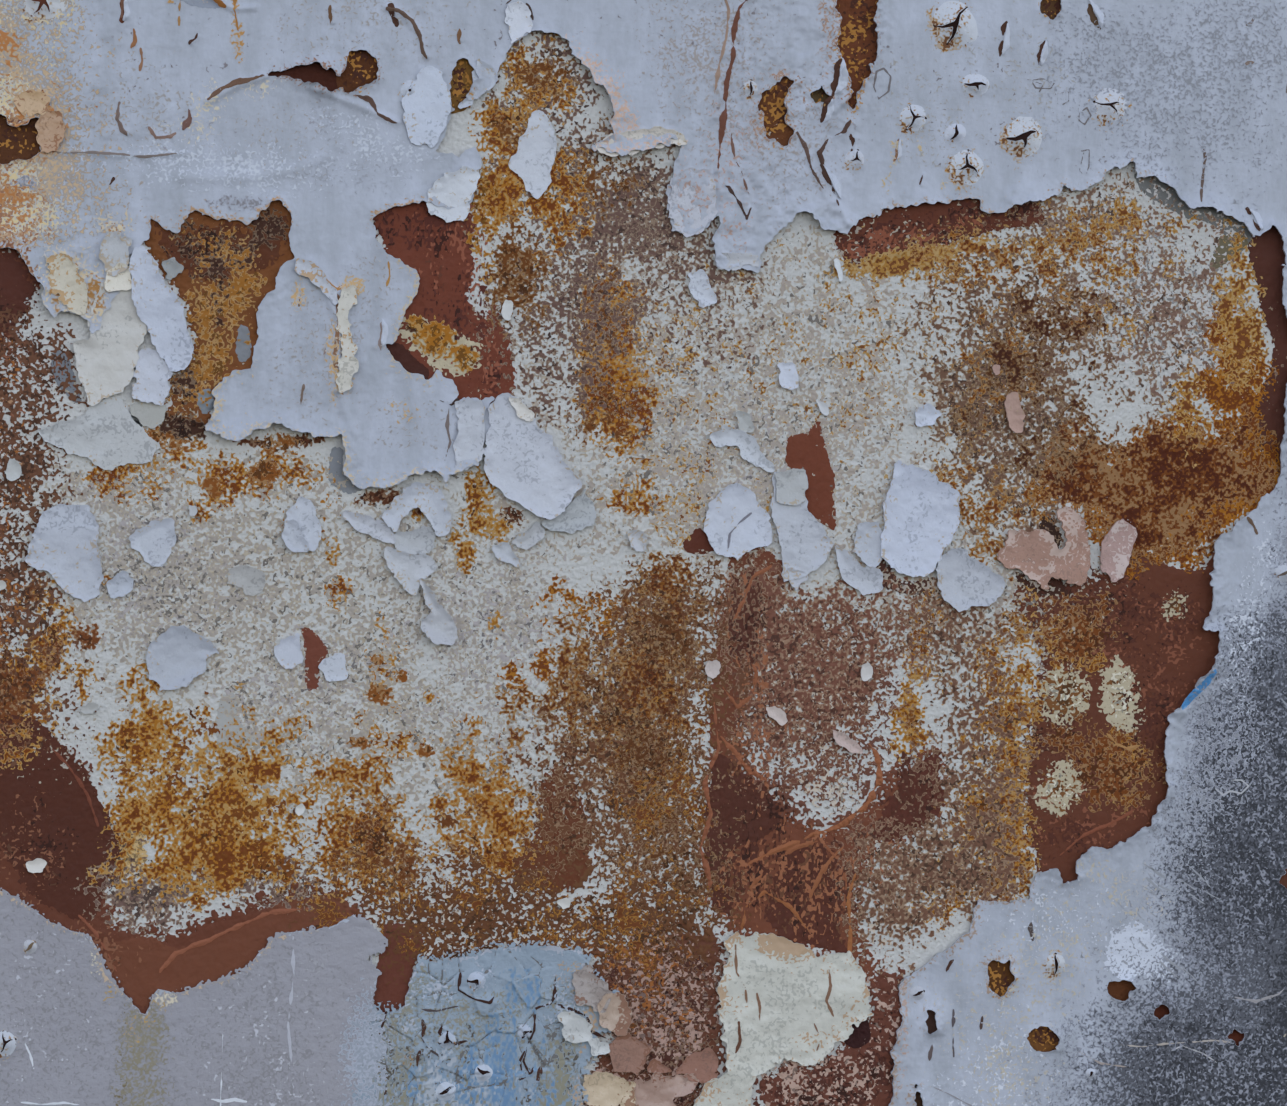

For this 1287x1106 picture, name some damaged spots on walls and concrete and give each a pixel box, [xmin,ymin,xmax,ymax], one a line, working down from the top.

corrosion [267,48,384,100]
corrosion [816,0,882,125]
peeling [13,89,66,153]
crack [712,0,755,220]
peeling [294,258,359,393]
corrosion [393,507,432,534]
peeling [1142,508,1250,571]
peeling [26,858,47,873]
peeling [104,816,290,942]
corrosion [978,940,1027,1002]
crack [379,951,605,1106]
corrosion [673,1069,704,1106]